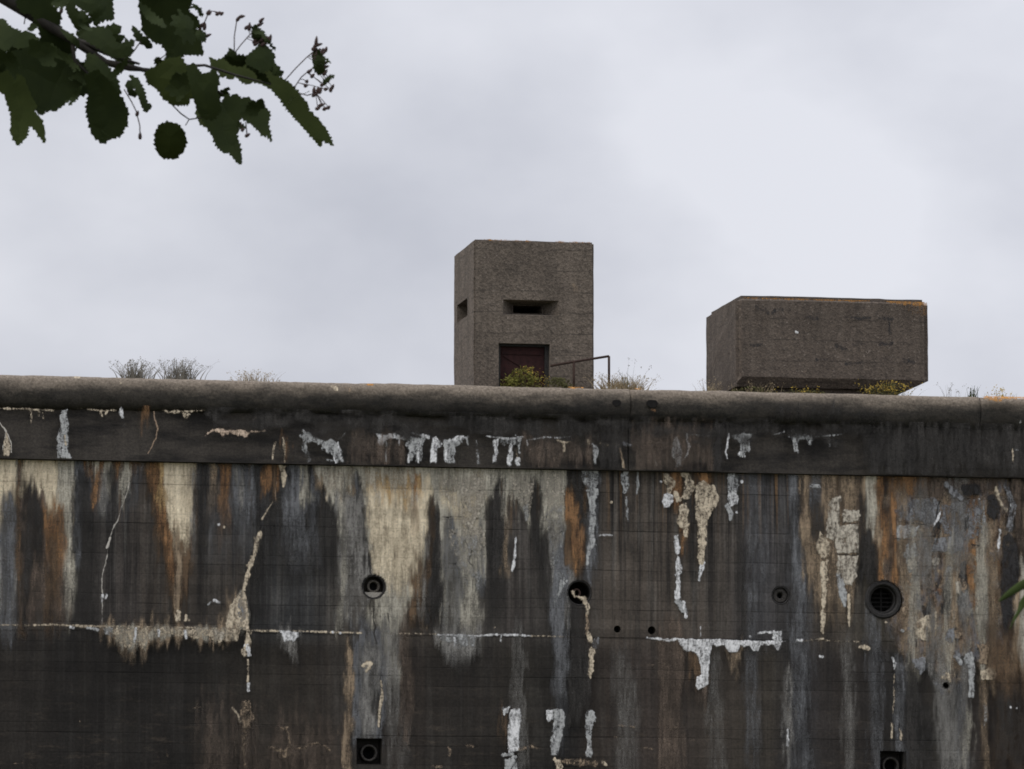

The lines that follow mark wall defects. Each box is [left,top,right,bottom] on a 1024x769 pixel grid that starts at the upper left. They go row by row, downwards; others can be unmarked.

peeling [299,429,343,463]
peeling [732,432,752,457]
corrosion [18,460,198,641]
leakage [0,407,870,769]
corrosion [564,470,590,574]
peeling [749,630,782,650]
peeling [798,475,862,634]
leakage [1006,558,1024,679]